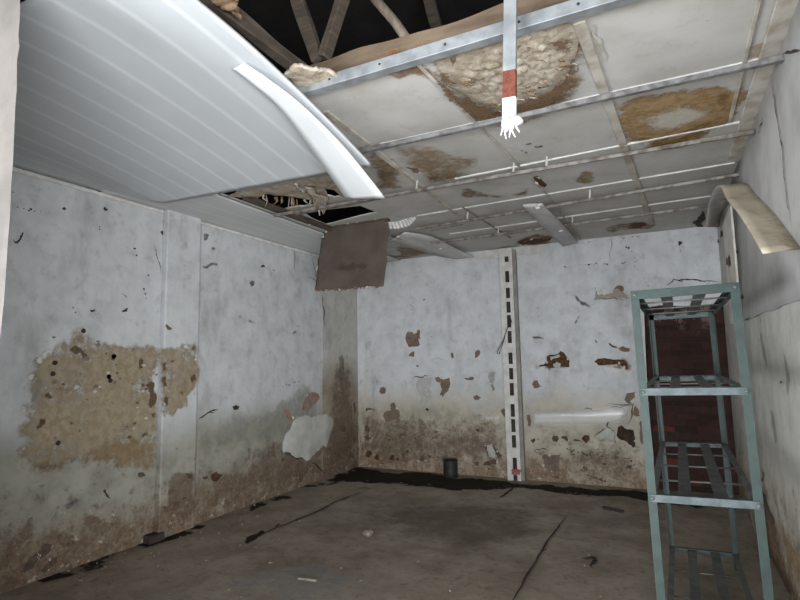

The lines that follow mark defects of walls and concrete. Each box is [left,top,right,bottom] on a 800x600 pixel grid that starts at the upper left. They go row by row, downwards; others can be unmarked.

leakage [618,86,748,148]
leakage [372,153,399,188]
leakage [404,150,471,182]
flaking render [536,351,570,368]
flaking render [595,343,630,372]
peeling [20,328,199,470]
flaking render [435,377,450,397]
leakage [304,418,702,508]
leakage [250,496,291,511]
leakage [137,525,205,547]
leakage [37,553,115,582]
crack [513,515,567,600]